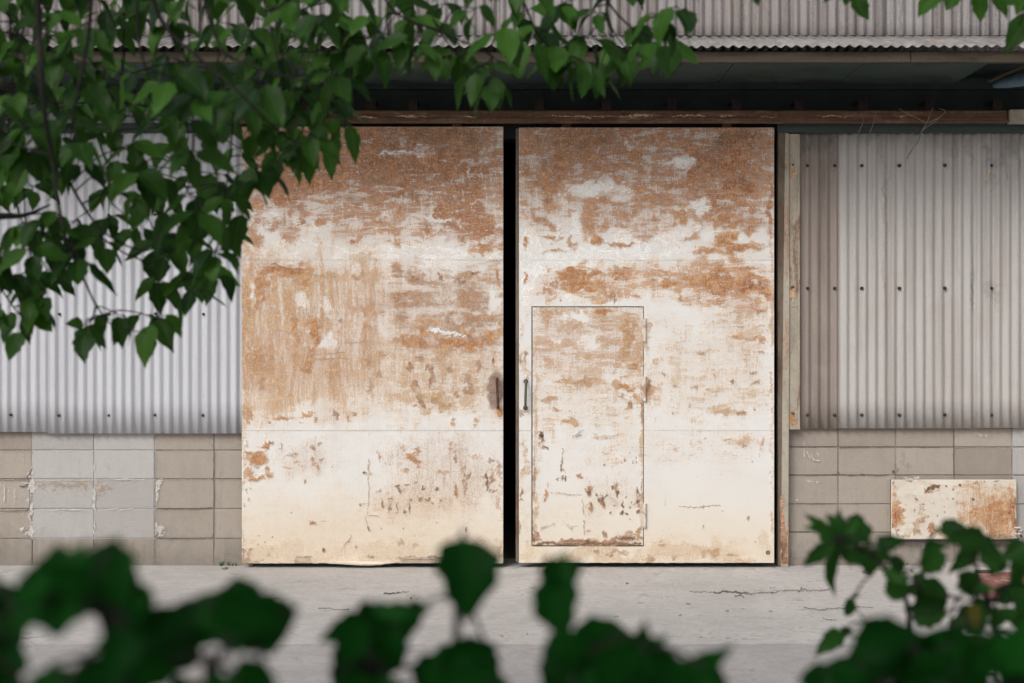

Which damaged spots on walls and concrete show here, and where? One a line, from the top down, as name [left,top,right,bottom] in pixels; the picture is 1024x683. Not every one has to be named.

rust [242,127,503,563]
rust [519,128,798,564]
crack [0,450,35,540]
crack [359,459,378,532]
rust [892,481,1016,539]
crack [689,588,873,621]